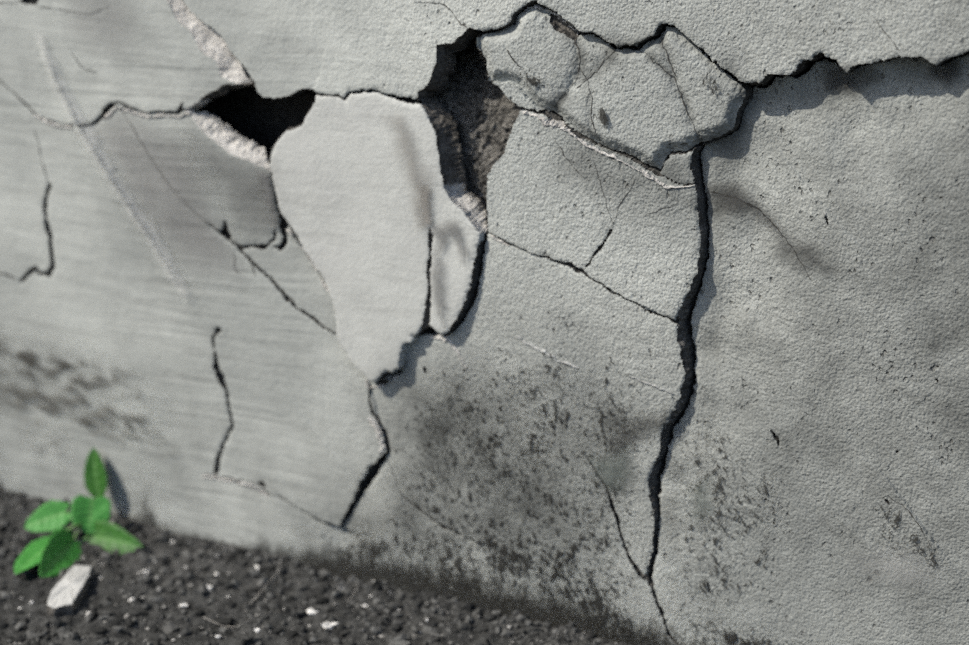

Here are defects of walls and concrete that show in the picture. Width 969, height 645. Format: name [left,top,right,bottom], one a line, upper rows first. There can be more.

crack [0,0,108,15]
crack [0,80,337,335]
crack [167,0,254,84]
peeling [183,27,524,382]
crack [318,89,422,104]
crack [413,0,969,645]
crack [202,328,501,546]
water stain [248,334,794,645]
water stain [871,505,938,568]